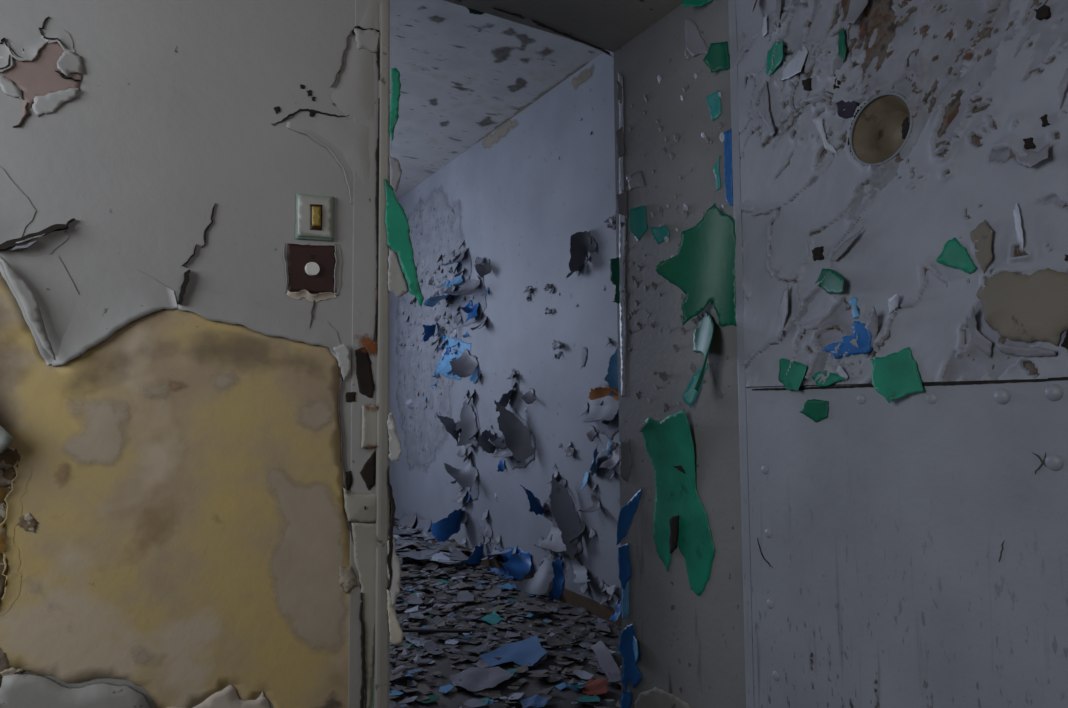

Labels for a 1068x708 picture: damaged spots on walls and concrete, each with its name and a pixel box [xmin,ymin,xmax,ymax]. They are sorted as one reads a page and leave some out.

peeling [0,17,83,127]
crack [274,26,381,125]
crack [0,218,75,257]
crack [177,203,216,304]
peeling [384,0,1068,708]
peeling [0,167,350,708]